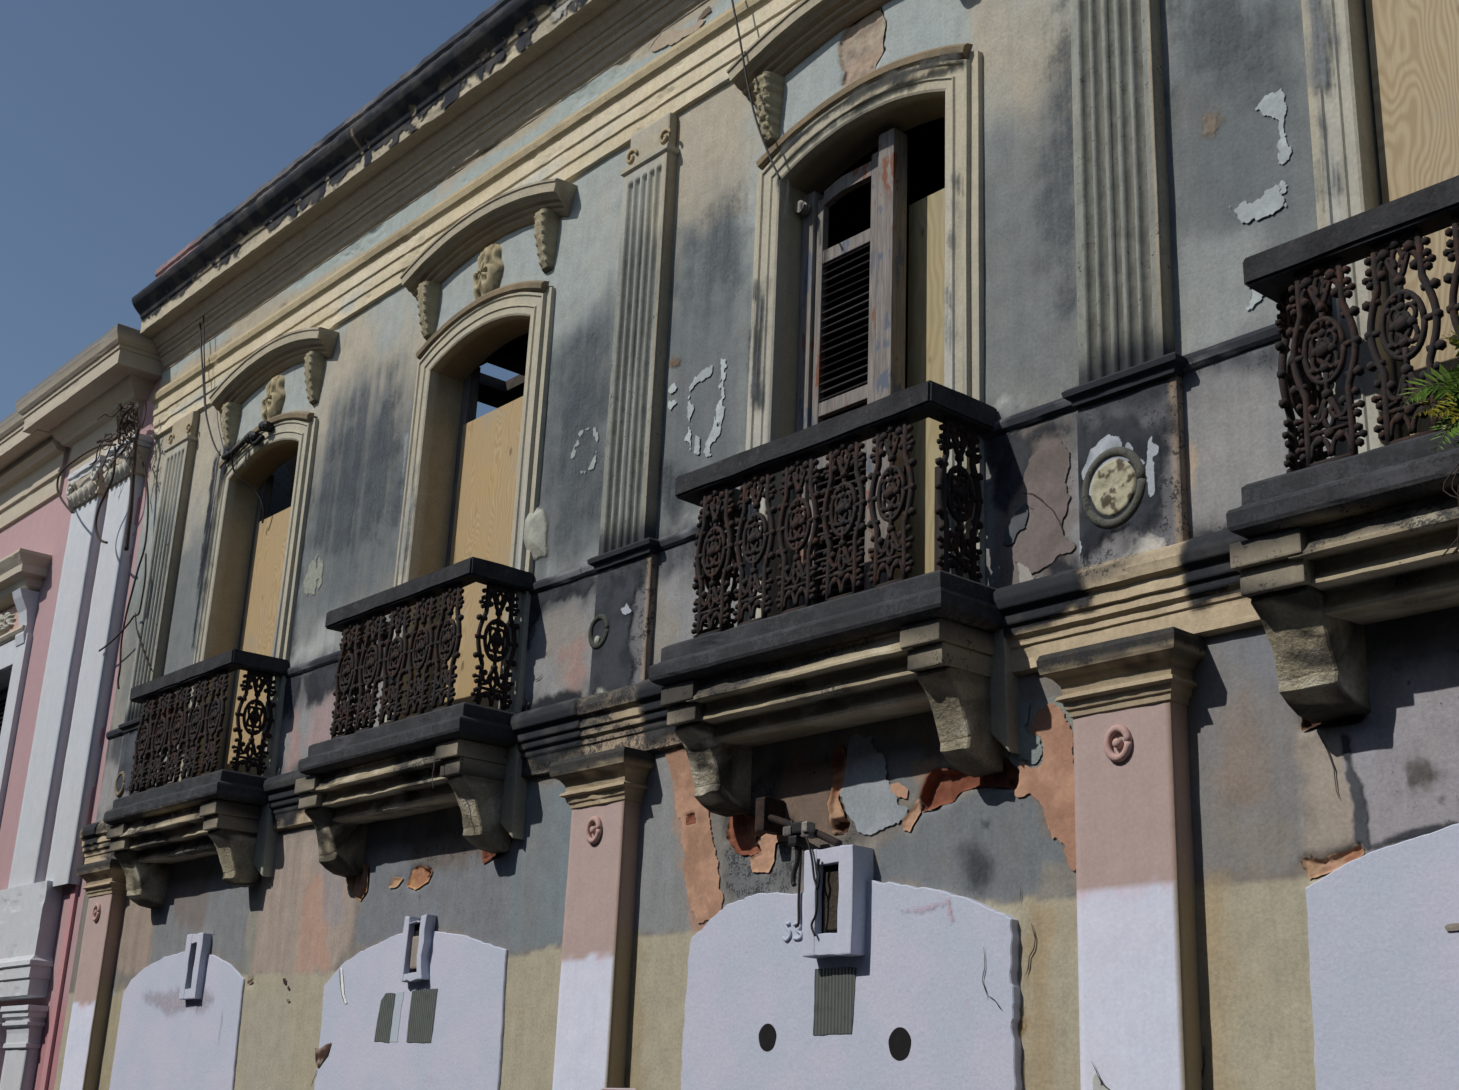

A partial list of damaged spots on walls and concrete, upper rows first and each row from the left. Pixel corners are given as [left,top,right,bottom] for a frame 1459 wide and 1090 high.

flaking render [838,7,886,86]
water stain [132,0,586,322]
peeling [1229,88,1292,223]
peeling [1246,287,1263,310]
water stain [307,395,412,573]
peeling [571,427,598,473]
peeling [668,358,727,457]
flaking render [1003,438,1075,583]
flaking render [665,748,788,923]
flaking render [827,701,1076,871]
peeling [1092,1063,1110,1090]